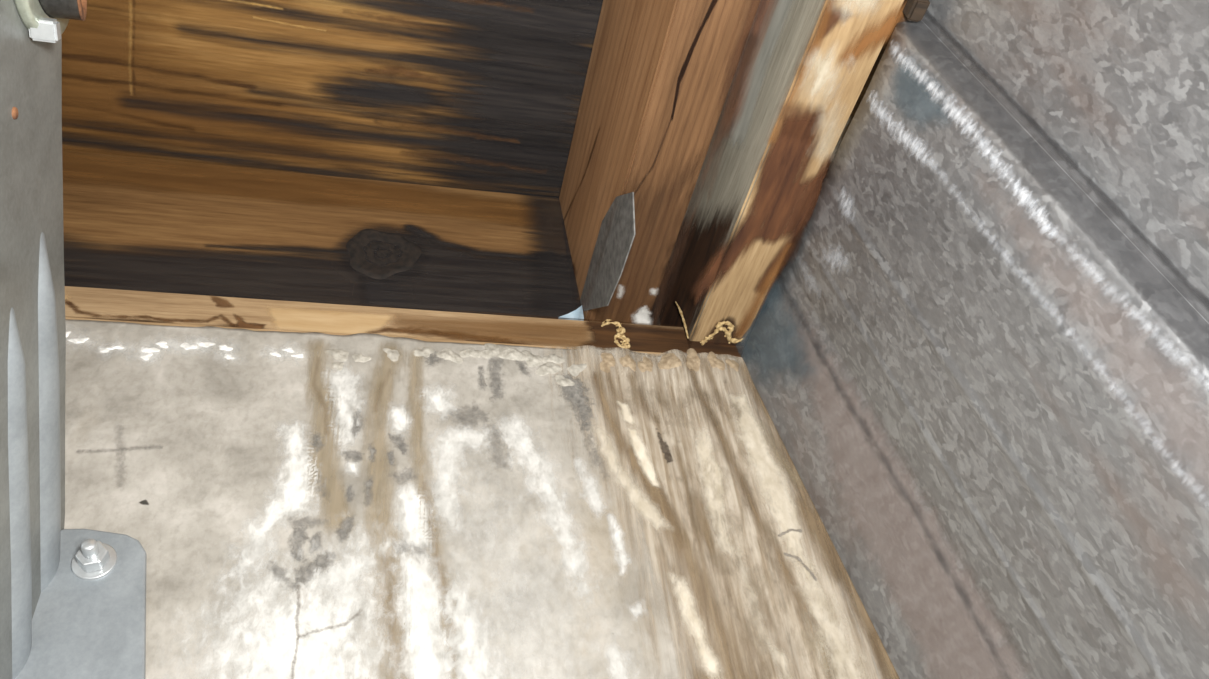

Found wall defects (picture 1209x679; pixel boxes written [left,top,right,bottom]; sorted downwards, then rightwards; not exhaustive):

leakage [62,0,904,679]